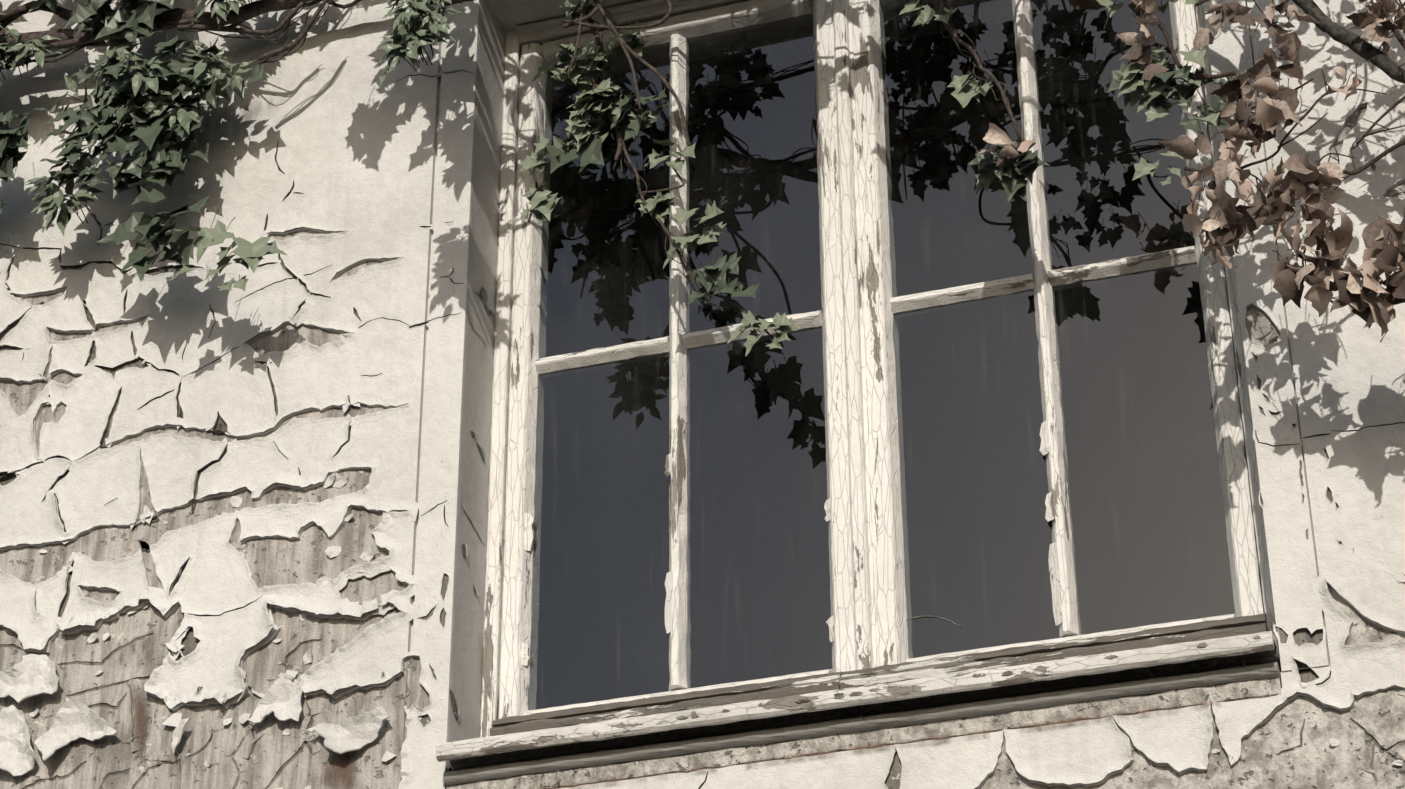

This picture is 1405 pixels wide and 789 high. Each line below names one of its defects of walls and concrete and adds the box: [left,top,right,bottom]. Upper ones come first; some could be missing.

peeling [0,340,87,464]
crack [0,138,487,513]
peeling [179,295,362,385]
peeling [1039,419,1050,456]
spalling [1242,301,1297,430]
crack [420,498,485,546]
peeling [1045,491,1055,523]
crack [28,554,82,629]
crack [136,540,264,623]
peeling [0,439,459,789]
peeling [1048,542,1062,626]
peeling [957,571,1405,789]